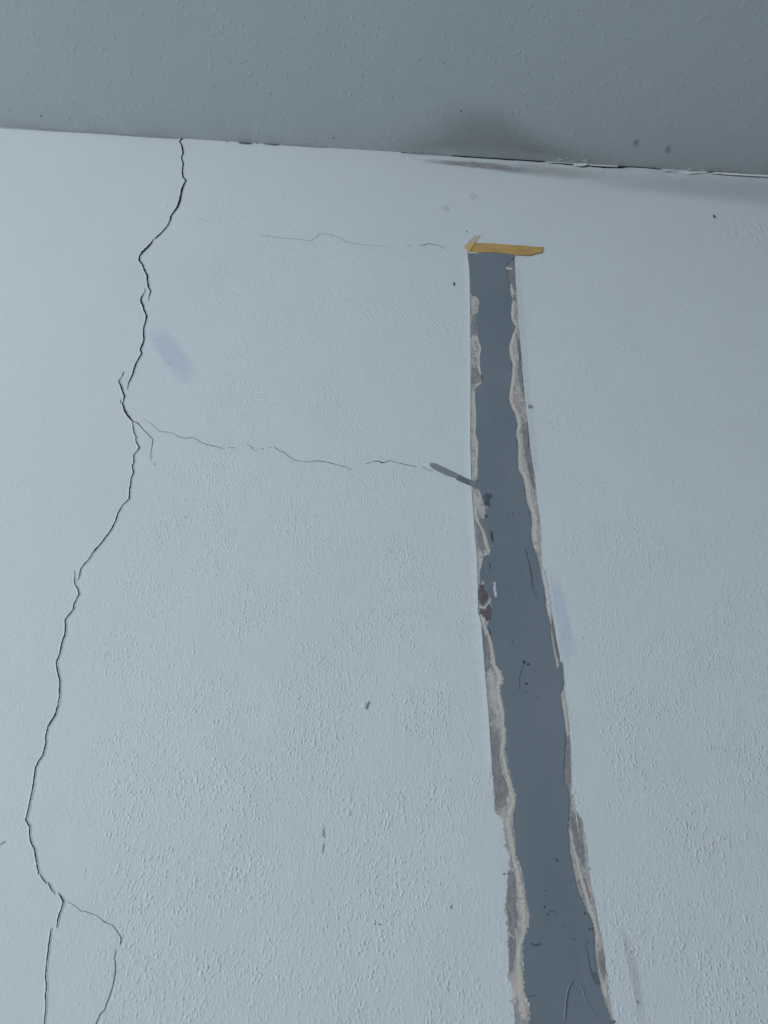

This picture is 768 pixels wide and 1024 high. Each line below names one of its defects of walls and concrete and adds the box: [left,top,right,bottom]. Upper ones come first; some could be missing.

crack [402,152,768,178]
crack [10,128,432,1024]
peeling [453,251,532,1024]
peeling [505,258,560,669]
peeling [560,686,615,1024]